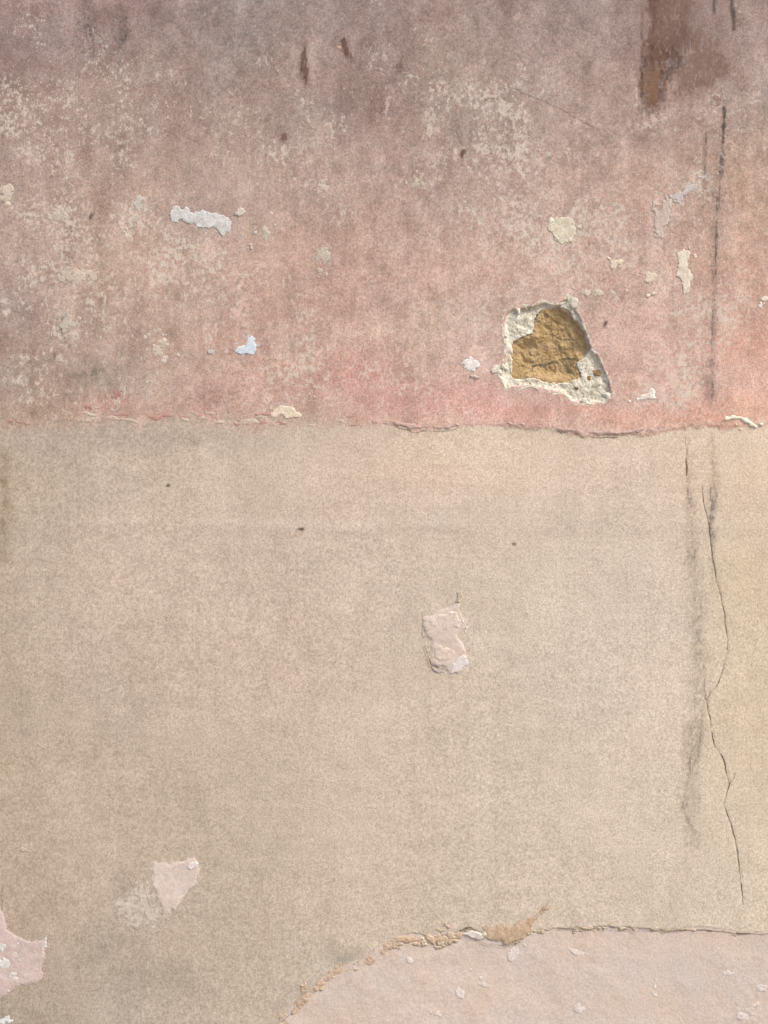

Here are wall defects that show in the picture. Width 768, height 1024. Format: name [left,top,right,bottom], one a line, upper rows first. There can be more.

rust [639,0,729,115]
peeling [166,202,278,249]
peeling [547,209,585,248]
peeling [647,165,711,247]
peeling [233,326,265,360]
spalling [460,245,704,410]
peeling [71,390,315,427]
peeling [421,590,470,680]
peeling [110,857,202,935]
peeling [0,909,47,998]
peeling [278,904,768,1024]